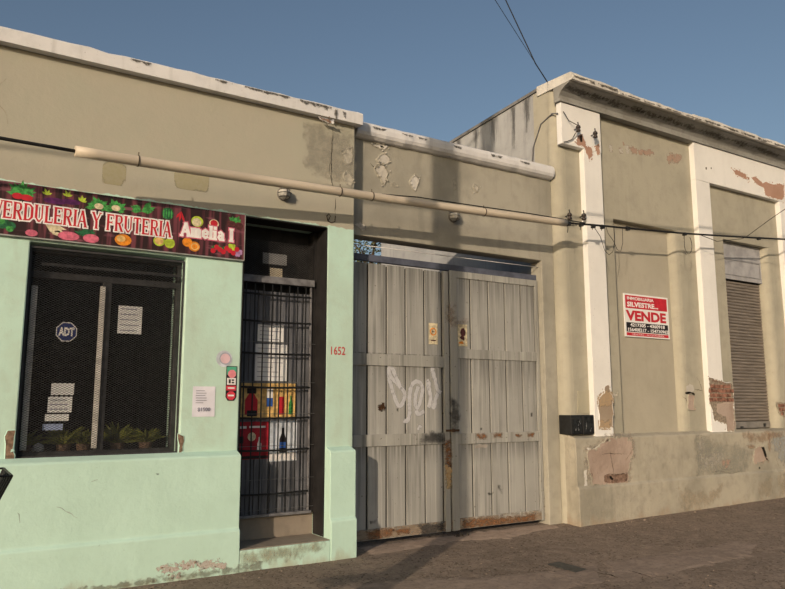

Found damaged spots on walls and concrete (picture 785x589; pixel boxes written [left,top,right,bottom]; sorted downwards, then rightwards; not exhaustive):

peeling [574,133,601,160]
peeling [370,142,398,188]
peeling [731,167,785,201]
flaking render [685,376,736,432]
flaking render [584,384,635,486]
rust [463,514,535,529]
peeling [157,560,226,579]